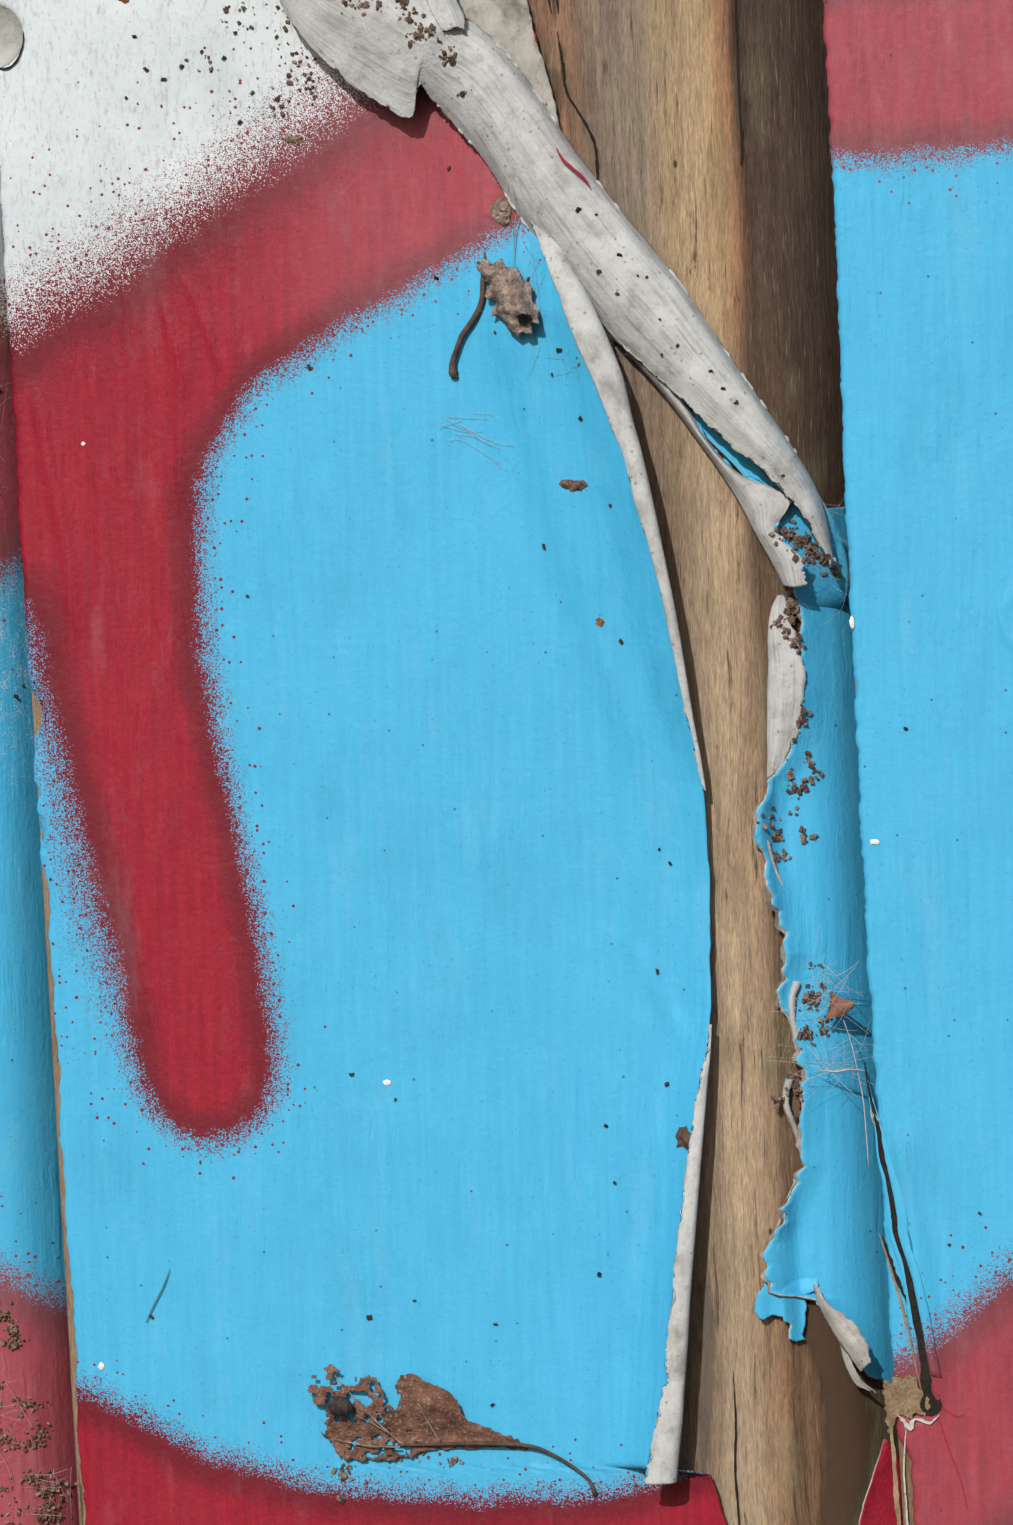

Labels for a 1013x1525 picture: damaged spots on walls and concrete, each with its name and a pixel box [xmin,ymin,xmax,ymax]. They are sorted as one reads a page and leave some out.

crack [548,0,599,180]
peeling [279,0,942,1525]